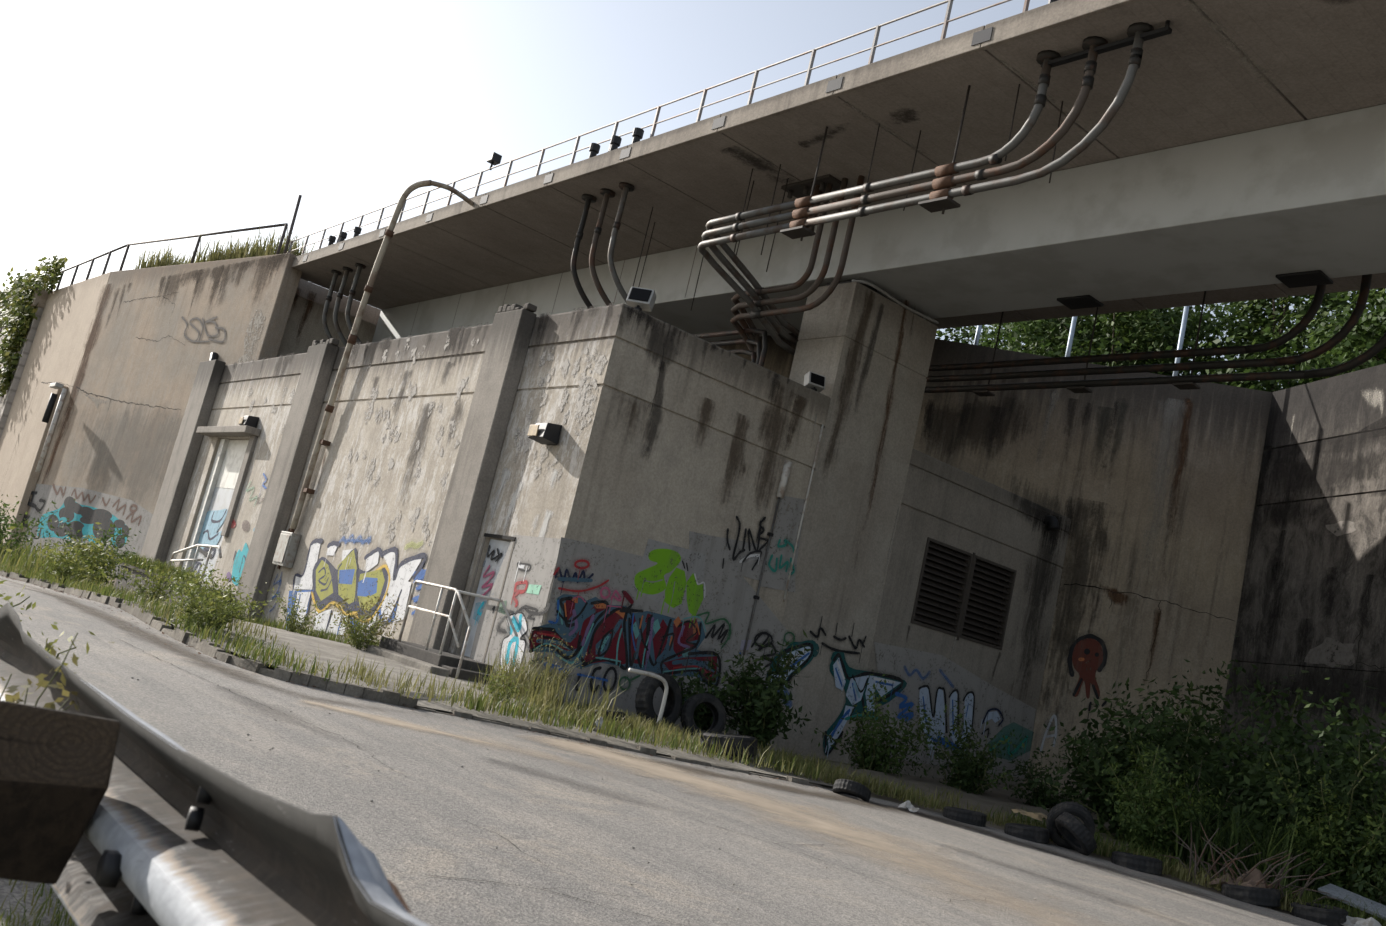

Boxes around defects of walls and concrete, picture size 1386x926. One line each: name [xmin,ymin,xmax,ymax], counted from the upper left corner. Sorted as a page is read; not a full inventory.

damp [158,252,291,300]
crack [1,382,181,488]
damp [571,302,688,450]
damp [700,398,712,434]
damp [726,372,805,496]
damp [825,291,883,462]
rust [1171,399,1193,492]
damp [1254,412,1386,571]
damp [1273,618,1386,716]